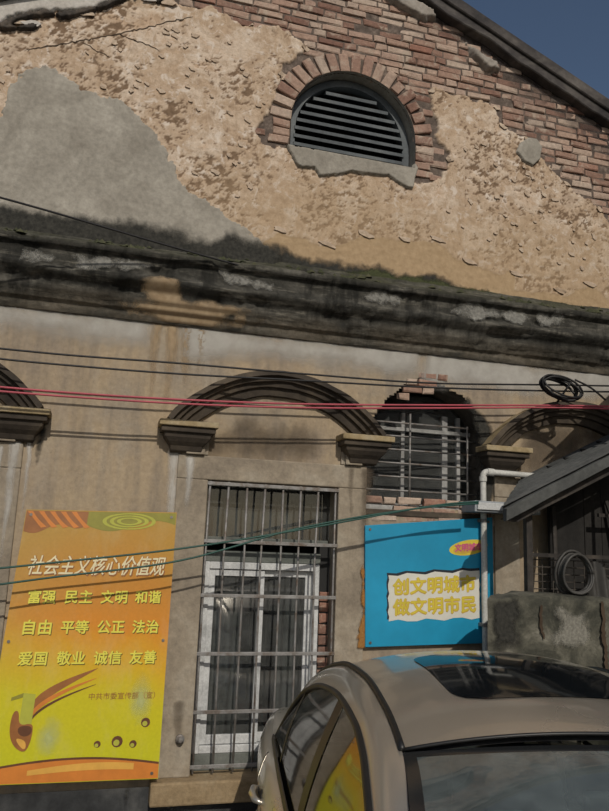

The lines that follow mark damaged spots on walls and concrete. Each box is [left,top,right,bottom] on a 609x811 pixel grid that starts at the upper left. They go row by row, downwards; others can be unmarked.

peeling [0,0,126,32]
crack [27,16,193,57]
spalling [143,0,609,220]
peeling [24,252,53,261]
peeling [78,256,145,270]
water stain [0,204,494,294]
peeling [223,272,272,290]
peeling [366,292,400,303]
water stain [0,306,146,339]
water stain [0,363,44,408]
flaking render [397,372,448,401]
water stain [0,427,46,477]